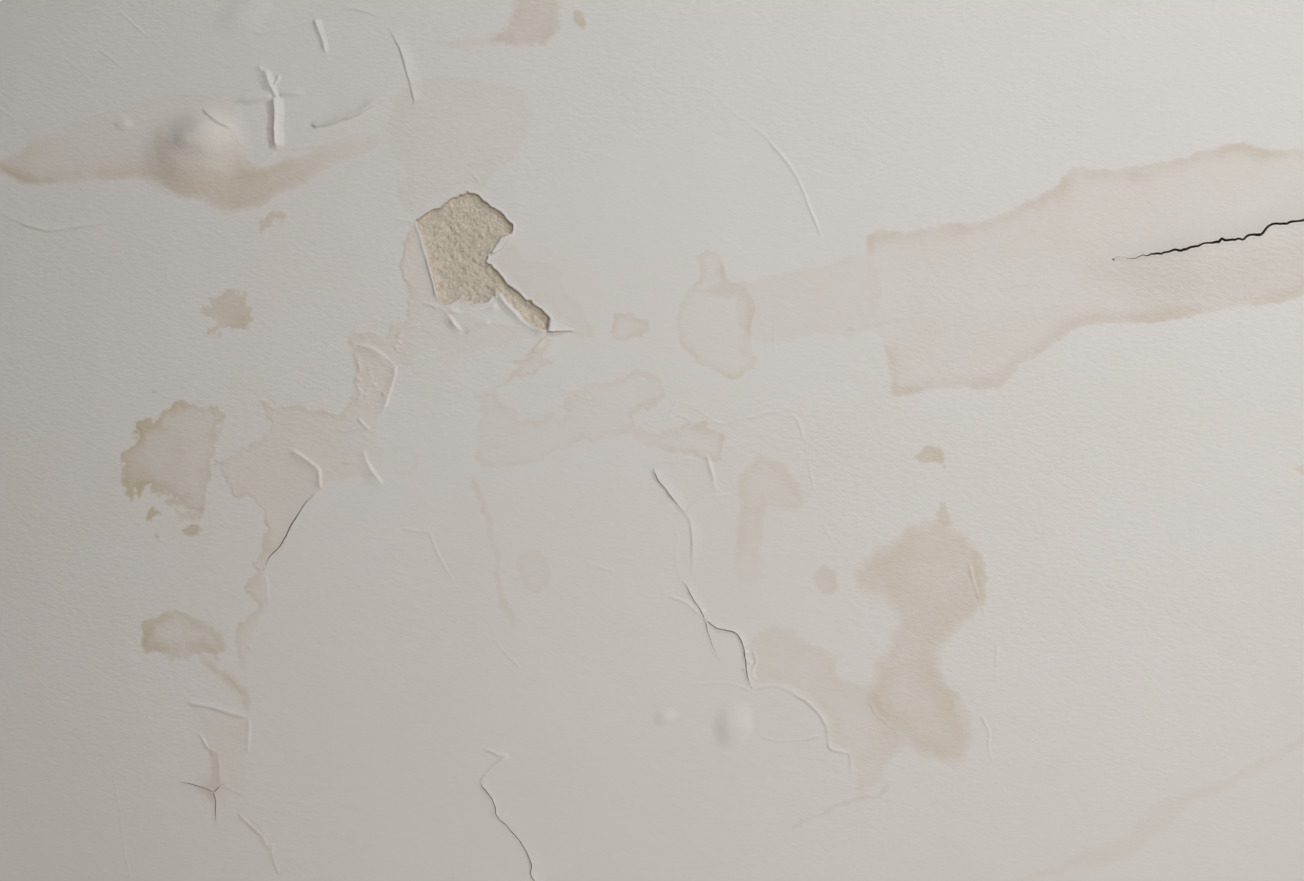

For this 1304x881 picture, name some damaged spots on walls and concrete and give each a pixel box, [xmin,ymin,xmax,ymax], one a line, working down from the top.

leakage [194,134,380,235]
leakage [199,287,256,340]
spalling [395,173,586,355]
leakage [675,141,1304,399]
crack [1113,217,1304,261]
leakage [112,398,228,539]
crack [262,488,321,570]
crack [651,466,686,513]
leakage [140,607,252,713]
crack [678,578,753,688]
leakage [739,501,991,831]
crack [479,775,537,881]